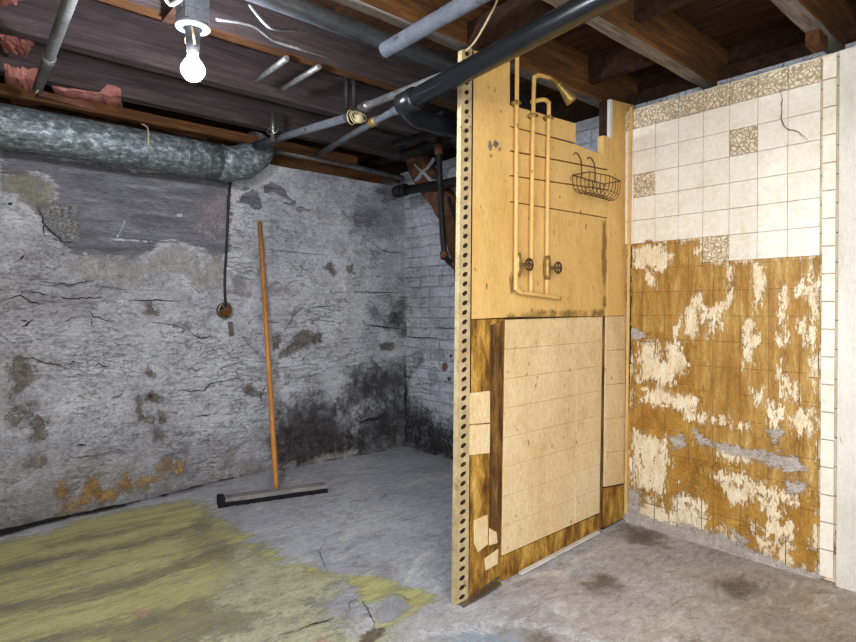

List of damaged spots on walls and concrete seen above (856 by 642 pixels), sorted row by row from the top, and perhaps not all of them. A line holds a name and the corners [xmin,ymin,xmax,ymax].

peeling [632,243,674,290]
crack [8,279,210,339]
water stain [372,300,407,335]
crack [14,356,107,369]
crack [170,367,234,414]
water stain [267,360,453,466]
peeling [628,261,821,541]
rust [52,456,186,516]
peeling [672,505,760,555]